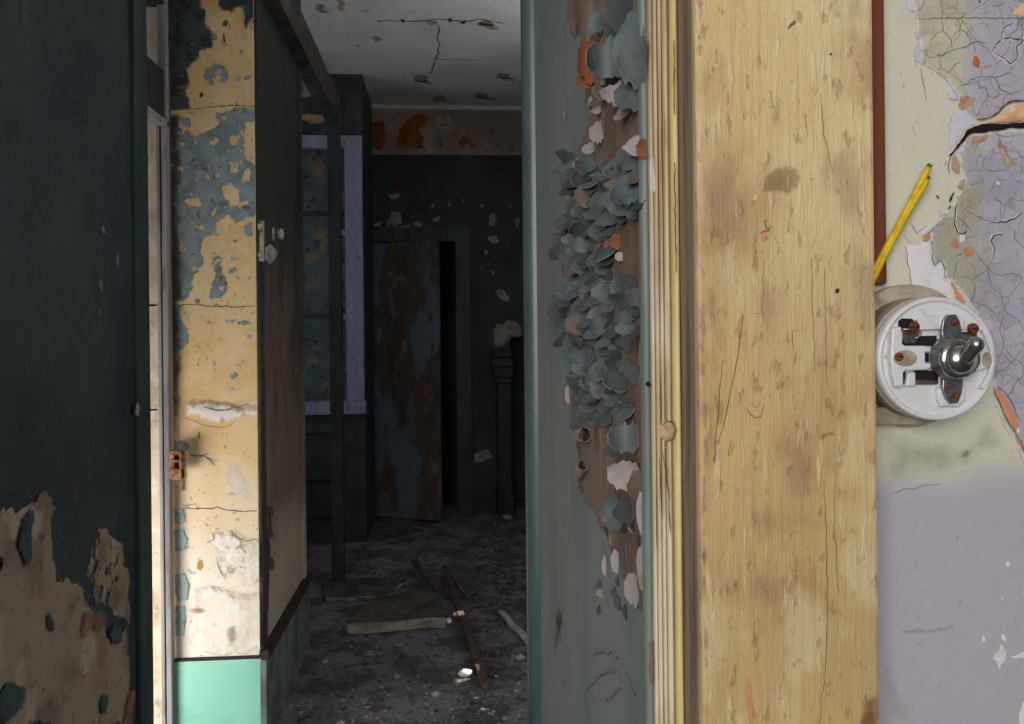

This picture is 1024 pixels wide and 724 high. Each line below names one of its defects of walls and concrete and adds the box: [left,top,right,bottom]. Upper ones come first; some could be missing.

peeling [200,63,229,97]
peeling [210,0,254,42]
crack [378,18,503,75]
peeling [372,114,428,150]
crack [948,100,1024,173]
peeling [171,107,255,352]
peeling [906,0,1024,463]
crack [149,300,251,308]
peeling [546,0,655,620]
crack [182,504,257,512]
peeling [0,490,135,724]
spalling [174,506,274,656]